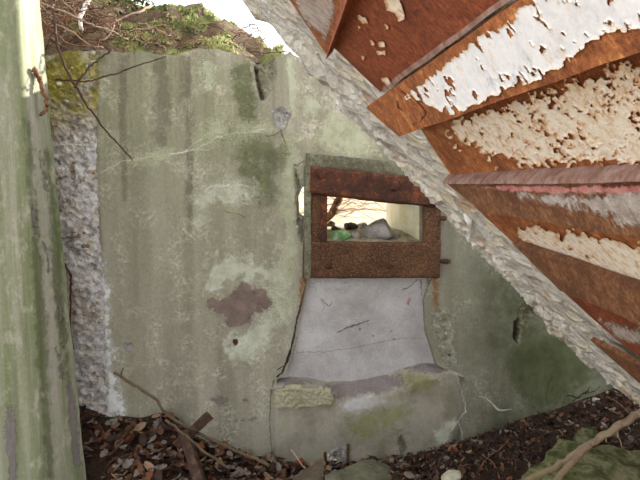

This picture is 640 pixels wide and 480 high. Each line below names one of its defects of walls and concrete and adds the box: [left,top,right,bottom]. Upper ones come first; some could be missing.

peeling [404,0,640,171]
spalling [46,50,109,416]
peeling [517,225,640,280]
damp [3,406,17,480]
crack [269,283,332,446]